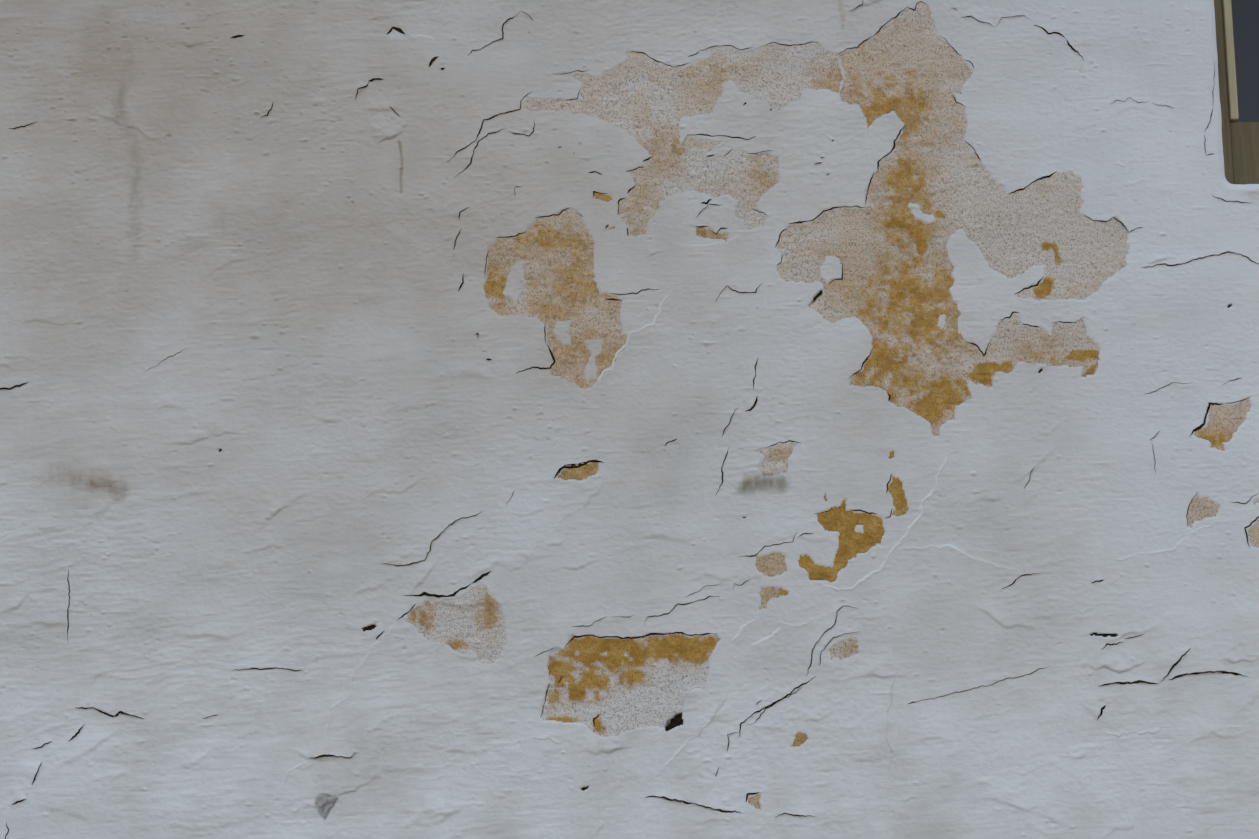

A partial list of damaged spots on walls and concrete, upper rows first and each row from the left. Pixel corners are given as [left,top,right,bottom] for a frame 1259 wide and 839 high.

crack [450,92,562,174]
peeling [484,208,627,389]
peeling [523,1,1129,437]
crack [1142,251,1258,268]
peeling [1190,397,1251,451]
spalling [554,460,604,480]
crack [383,491,514,567]
peeling [746,474,908,610]
peeling [1186,491,1259,548]
peeling [399,571,506,664]
spalling [535,632,720,737]
crack [1097,648,1243,738]